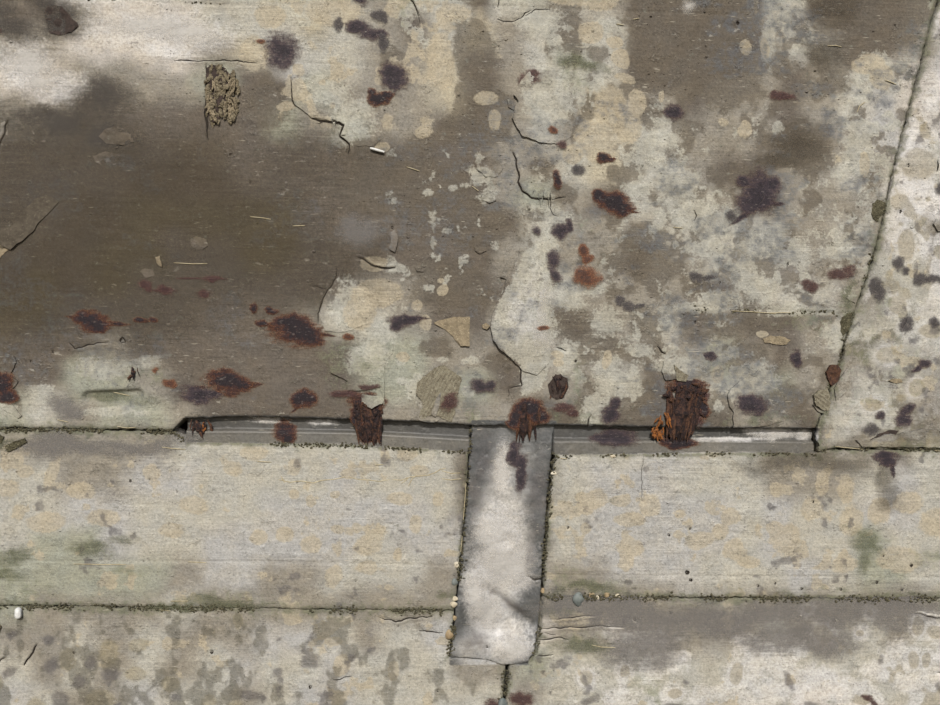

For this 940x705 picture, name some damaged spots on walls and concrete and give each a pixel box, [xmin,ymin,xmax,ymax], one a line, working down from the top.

leakage [17,77,132,147]
crack [291,81,358,156]
rust [592,189,639,217]
rust [532,218,603,289]
rust [249,304,354,348]
rust [0,372,19,404]
rust [153,367,262,405]
rust [330,384,387,446]
spalling [416,365,462,423]
crack [508,367,527,396]
rust [506,374,579,491]
rust [651,379,710,450]